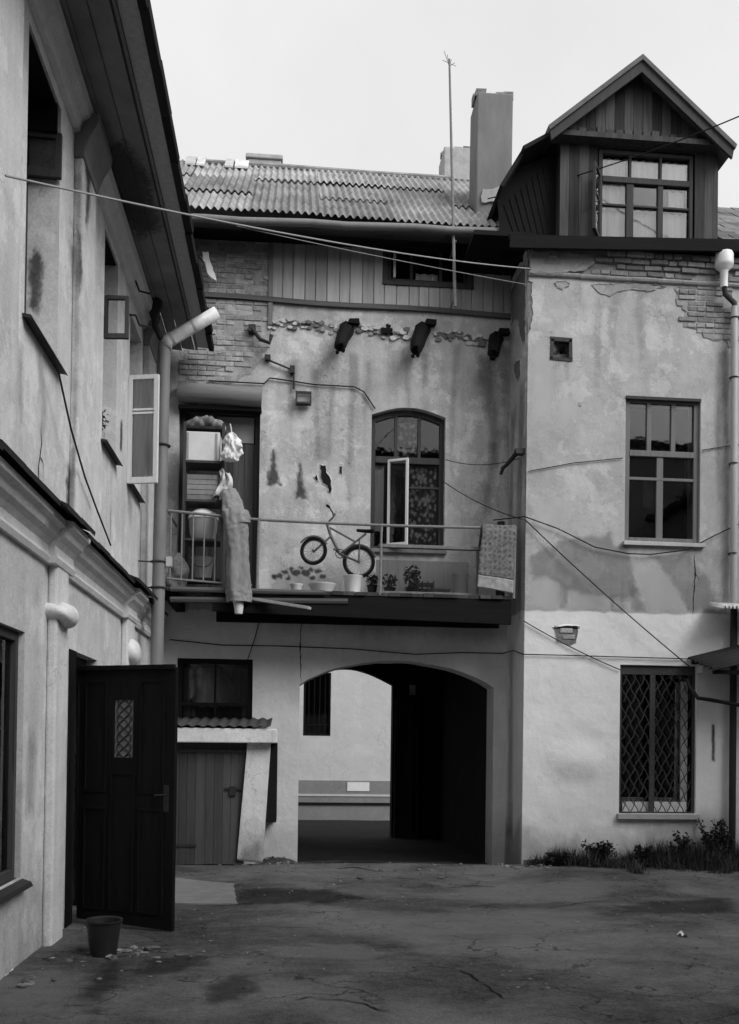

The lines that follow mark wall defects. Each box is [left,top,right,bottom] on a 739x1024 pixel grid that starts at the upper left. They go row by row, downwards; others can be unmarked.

leakage [29,252,43,309]
flaking render [553,280,571,291]
flaking render [591,280,739,349]
leakage [267,450,281,485]
leakage [296,464,305,498]
crack [692,556,700,610]